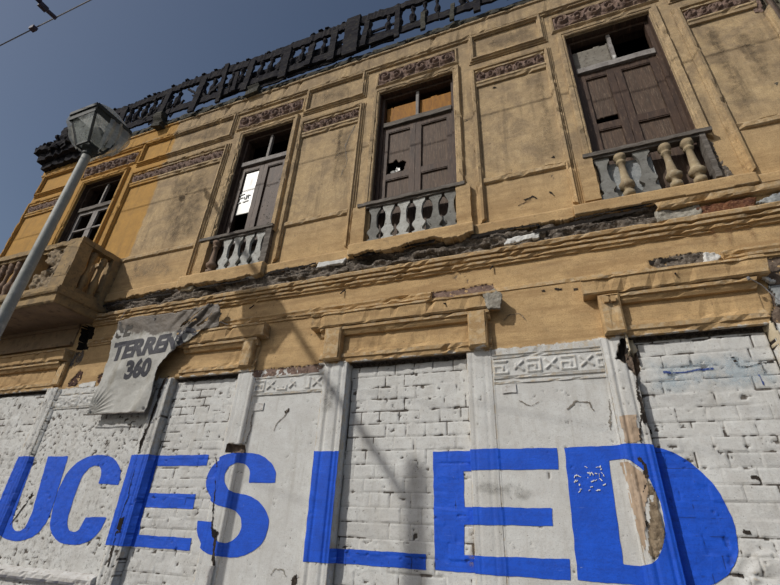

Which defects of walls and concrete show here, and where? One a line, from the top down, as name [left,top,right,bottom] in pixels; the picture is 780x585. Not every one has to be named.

spalling [751,0,780,12]
peeling [756,192,780,205]
spalling [103,203,702,313]
spalling [649,252,721,268]
spalling [761,256,780,323]
crack [763,318,780,349]
crack [107,376,169,567]
crack [210,456,218,566]
peeling [620,462,664,559]